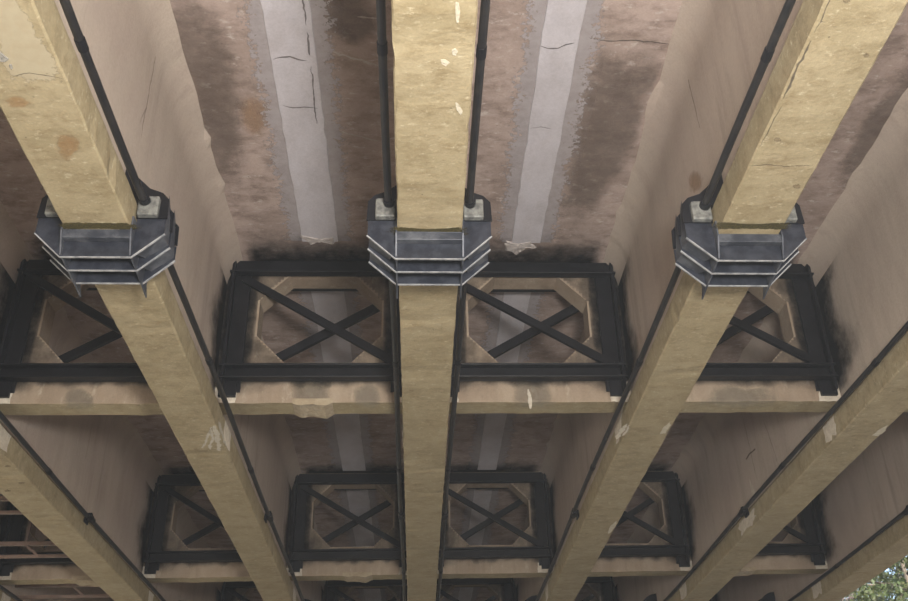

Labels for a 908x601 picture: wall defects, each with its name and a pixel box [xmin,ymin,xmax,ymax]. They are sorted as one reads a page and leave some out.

crack [273,0,318,121]